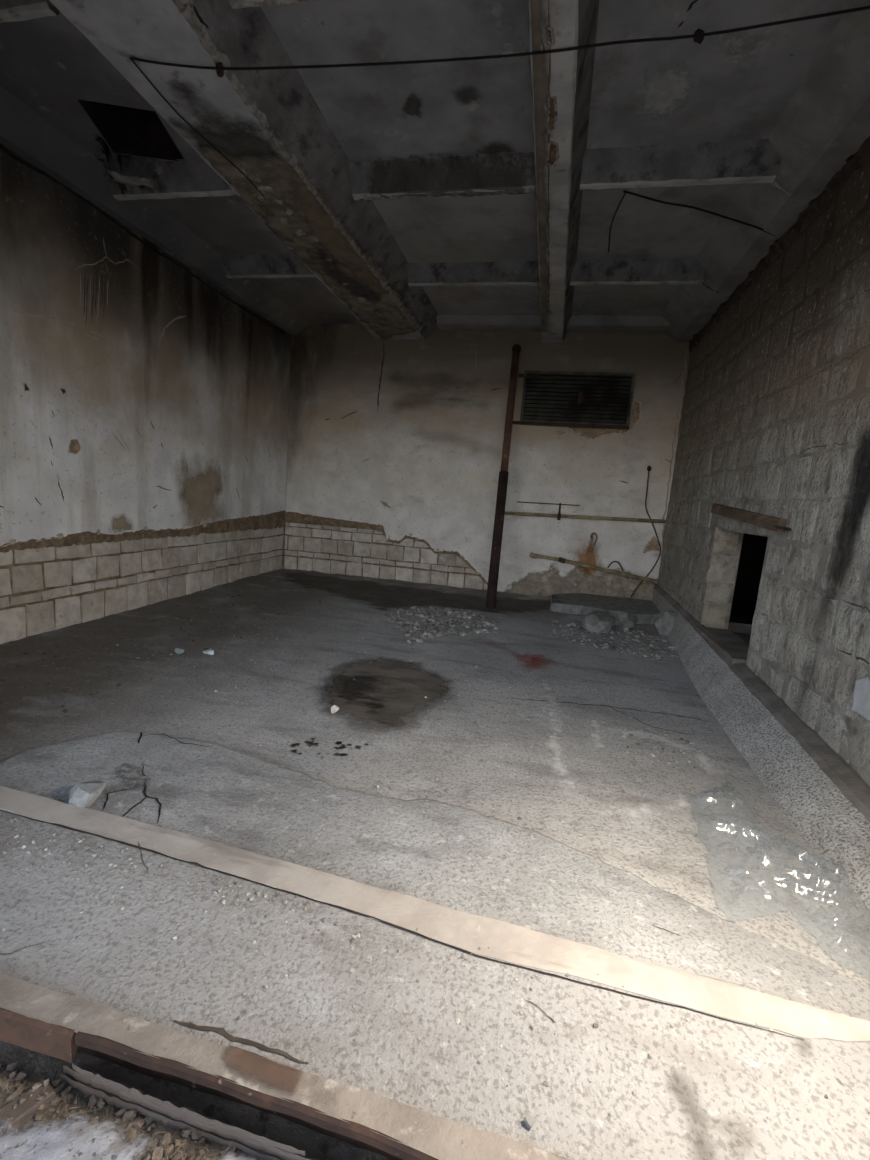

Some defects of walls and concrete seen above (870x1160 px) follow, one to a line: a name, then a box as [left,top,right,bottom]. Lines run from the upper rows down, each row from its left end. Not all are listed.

water stain [182,467,221,526]
spalling [0,511,488,644]
spalling [505,564,657,600]
water stain [326,659,449,727]
crack [102,732,211,872]
crack [174,1020,309,1064]